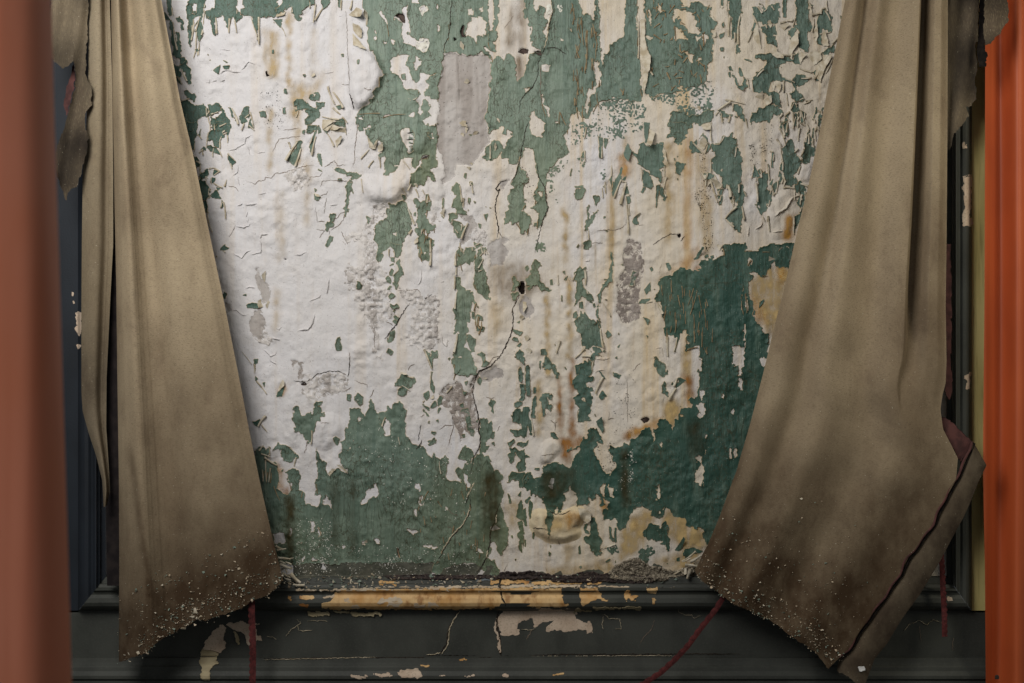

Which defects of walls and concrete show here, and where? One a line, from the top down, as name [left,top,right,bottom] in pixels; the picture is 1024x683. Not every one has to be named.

crack [495,8,566,251]
crack [416,295,520,561]
peeling [164,0,842,653]
rust [561,422,582,458]
peeling [199,621,262,681]